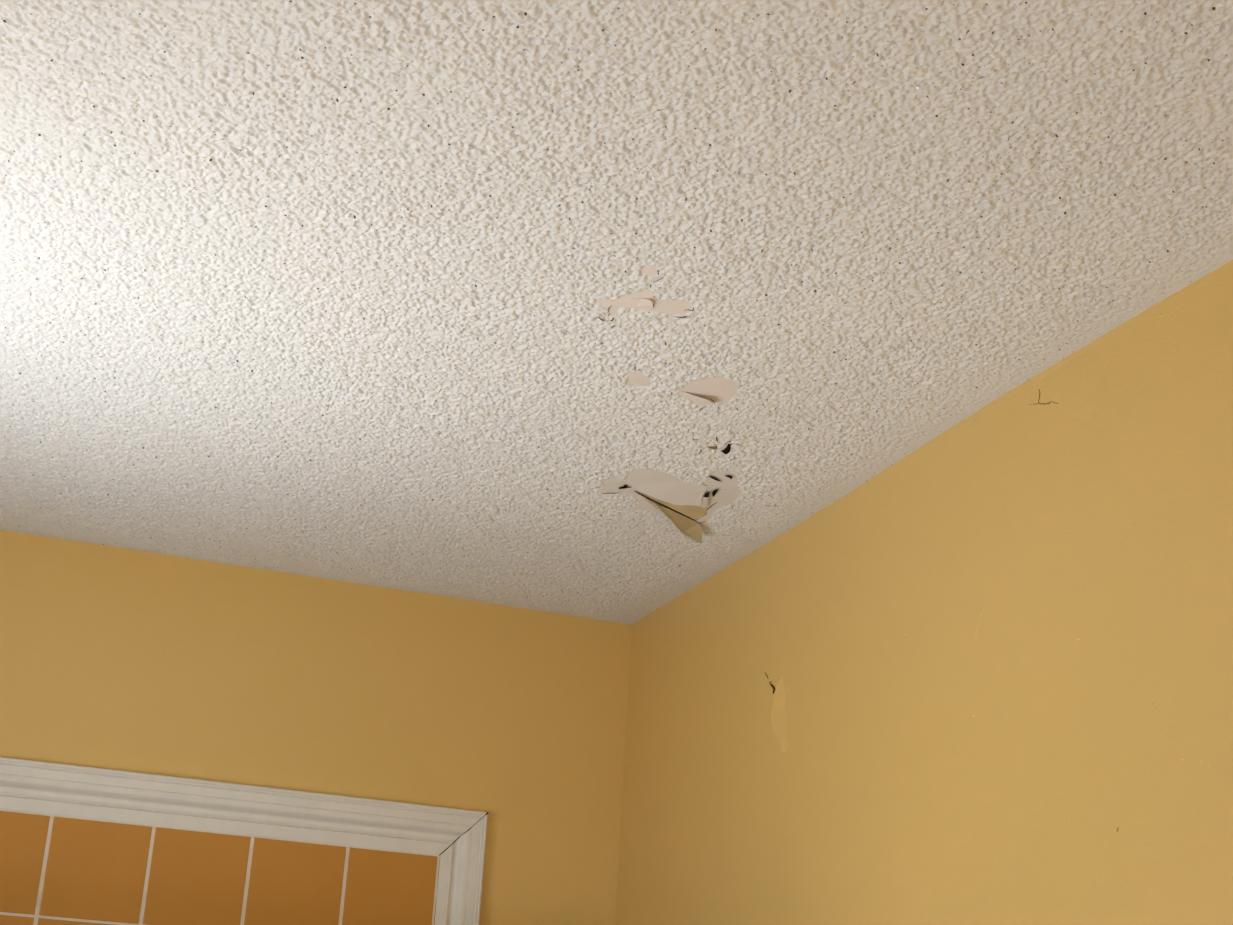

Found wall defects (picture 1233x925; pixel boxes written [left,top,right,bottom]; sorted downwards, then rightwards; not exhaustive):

peeling [597,265,694,327]
peeling [678,377,742,411]
peeling [602,469,741,543]